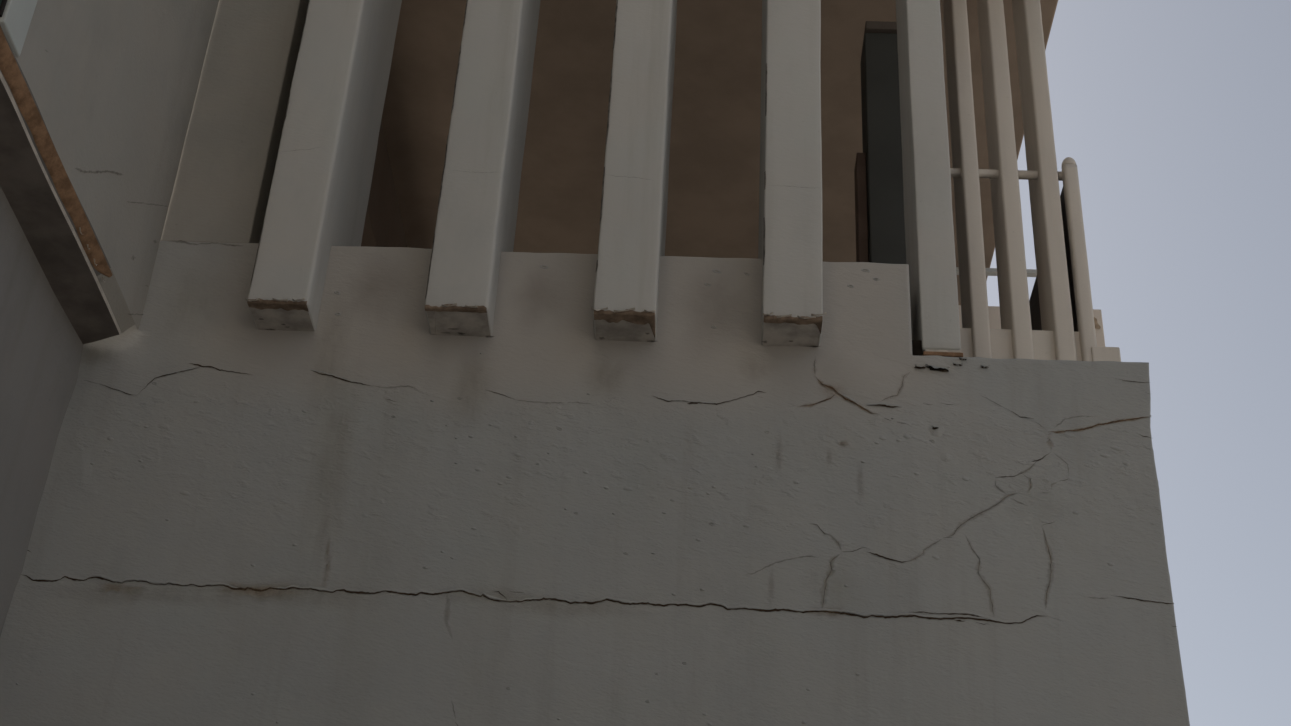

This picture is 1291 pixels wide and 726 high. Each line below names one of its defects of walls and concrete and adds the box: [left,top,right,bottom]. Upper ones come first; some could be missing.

crack [100,363,251,395]
crack [310,369,395,402]
flaking render [914,357,989,372]
crack [24,379,1151,625]
crack [1117,595,1176,627]